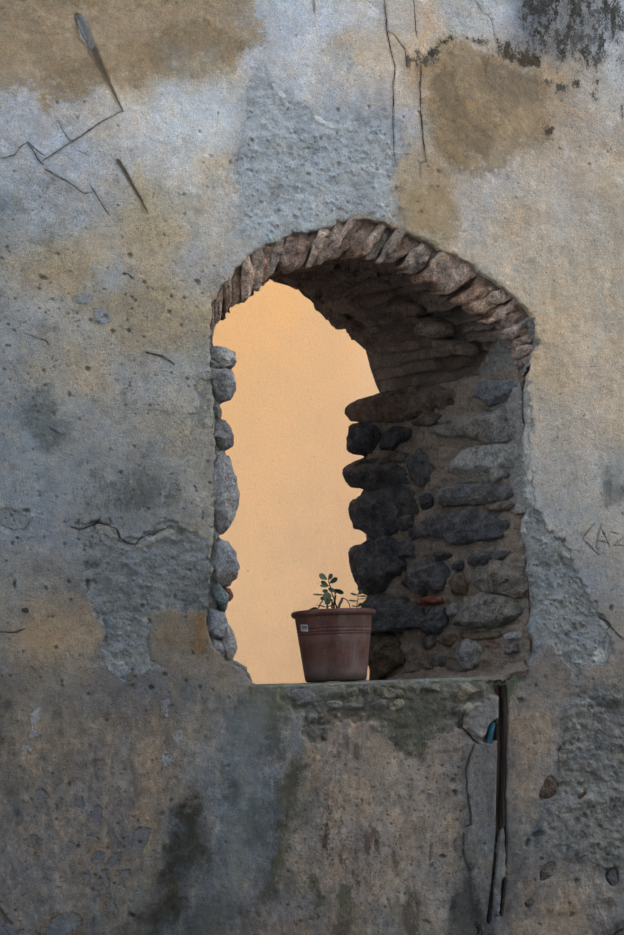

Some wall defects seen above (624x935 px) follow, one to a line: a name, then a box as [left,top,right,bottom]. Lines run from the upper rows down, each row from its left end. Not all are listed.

crack [384,0,426,172]
damp [466,0,624,101]
crack [0,142,91,194]
crack [72,519,170,545]
spalling [75,520,211,682]
crack [457,711,478,871]
spalling [539,683,624,886]
damp [401,887,420,935]
peeling [513,900,604,935]